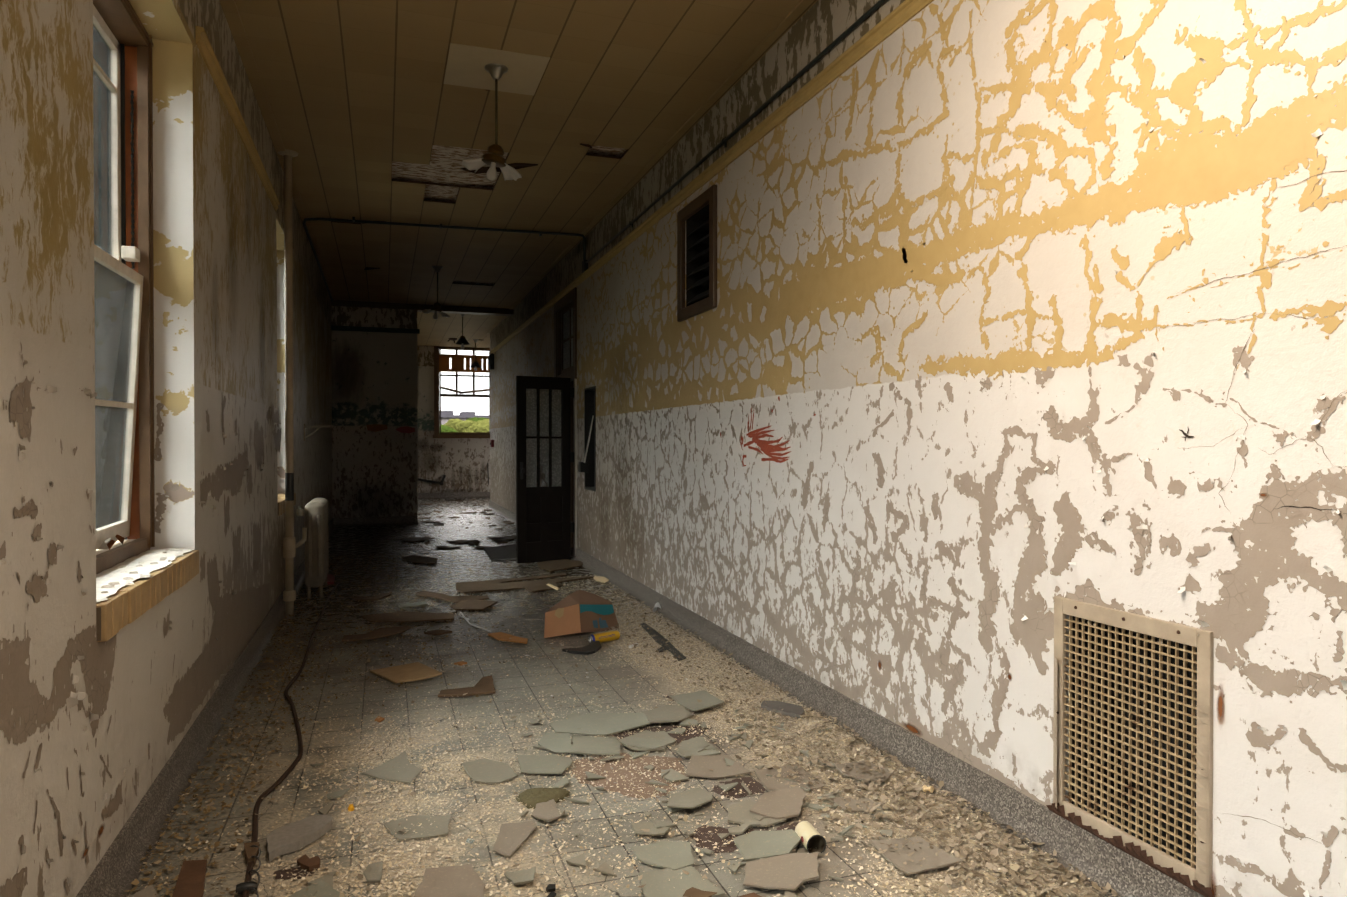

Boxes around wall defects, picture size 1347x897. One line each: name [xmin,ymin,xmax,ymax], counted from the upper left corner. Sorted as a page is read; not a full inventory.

peeling [3,360,57,461]
peeling [154,403,164,461]
peeling [726,0,1347,807]
crack [1176,245,1347,514]
peeling [0,487,64,607]
peeling [155,484,183,533]
peeling [163,396,281,745]
peeling [0,615,137,823]
peeling [558,589,1118,897]
peeling [1270,809,1305,840]
peeling [1214,885,1233,897]